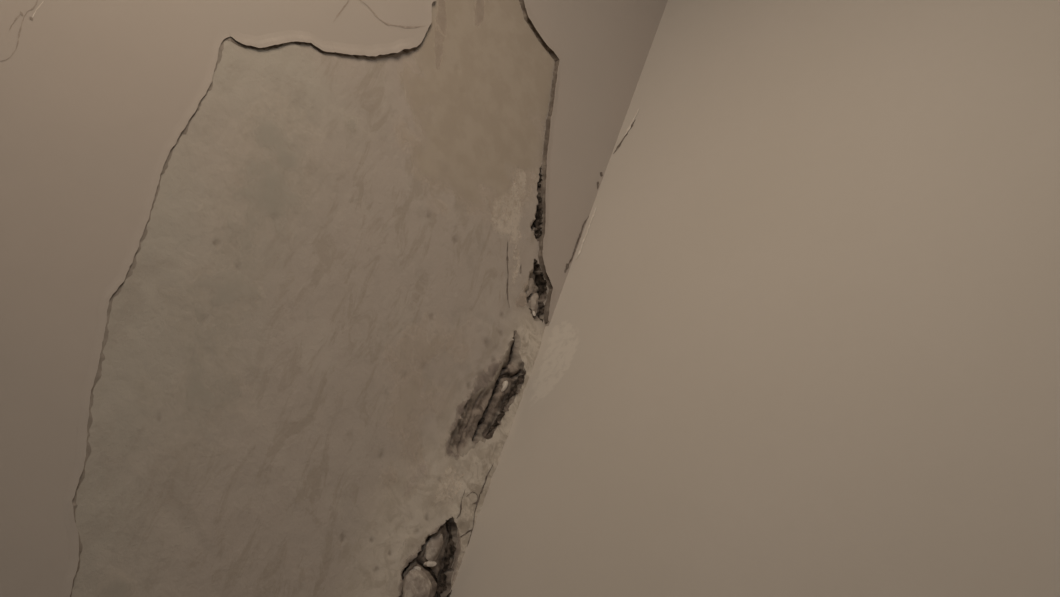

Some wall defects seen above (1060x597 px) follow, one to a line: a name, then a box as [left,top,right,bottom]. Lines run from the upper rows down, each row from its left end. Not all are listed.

crack [2,0,43,61]
crack [564,108,639,273]
flaking render [60,0,563,597]